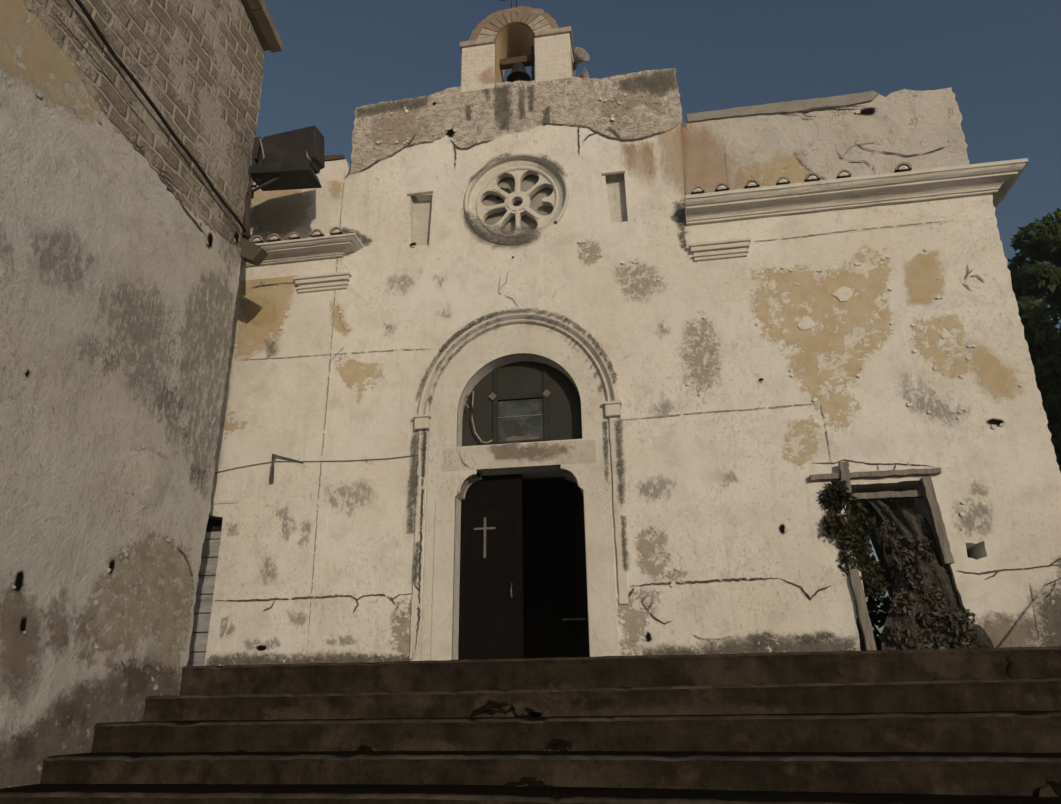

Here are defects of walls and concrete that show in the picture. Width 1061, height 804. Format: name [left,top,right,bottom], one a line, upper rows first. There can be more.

crack [535,120,678,153]
crack [837,142,946,172]
peeling [233,275,295,357]
peeling [335,355,385,403]
peeling [751,246,894,466]
peeling [911,314,1023,396]
crack [177,257,426,661]
flaking render [987,418,1004,429]
crack [628,577,833,624]
crack [960,558,1061,637]
water stain [0,588,94,699]
water stain [0,663,180,789]